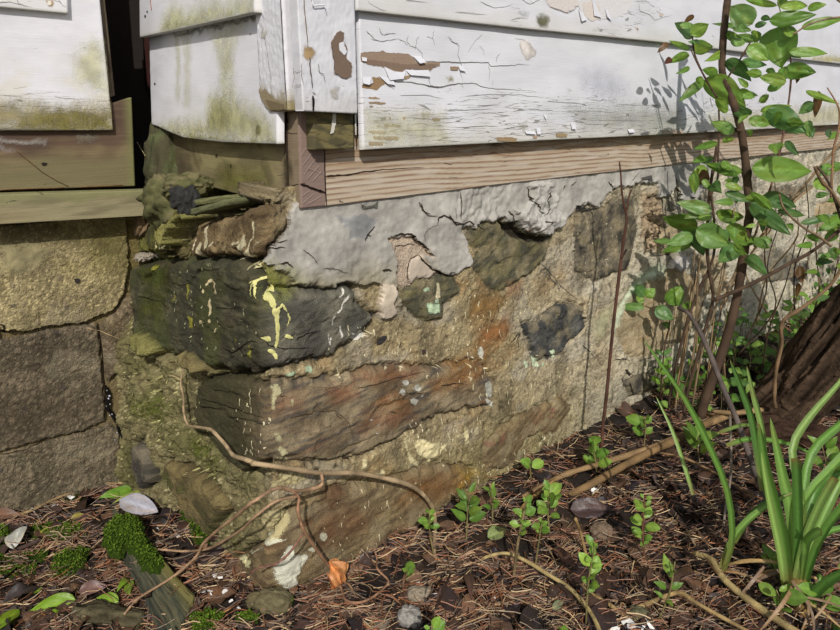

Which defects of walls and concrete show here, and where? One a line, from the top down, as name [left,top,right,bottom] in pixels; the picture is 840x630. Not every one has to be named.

peeling [331,31,440,107]
crack [368,0,539,131]
damp [178,97,268,142]
peeling [369,117,406,146]
crack [545,102,649,134]
spalling [496,220,549,243]
spalling [388,235,443,287]
crack [223,331,318,354]
crack [0,296,166,455]